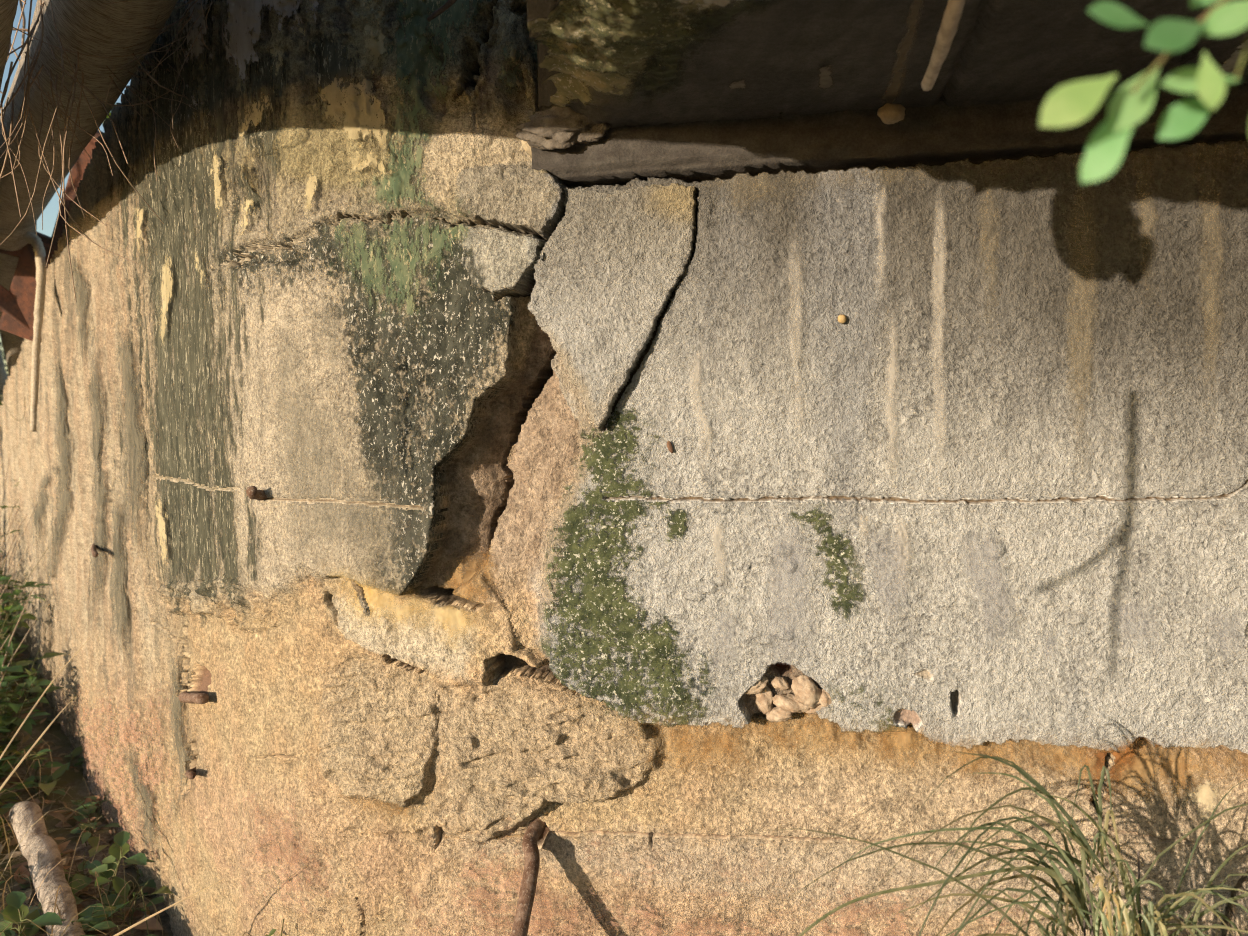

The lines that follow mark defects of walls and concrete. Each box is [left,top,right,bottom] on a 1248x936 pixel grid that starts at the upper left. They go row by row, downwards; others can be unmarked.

peeling [321,0,392,175]
water stain [498,0,776,107]
water stain [33,364,71,576]
peeling [157,256,173,342]
water stain [69,0,518,653]
peeling [323,105,697,694]
crack [490,351,557,545]
crack [601,189,700,433]
water stain [664,509,687,542]
crack [602,480,1248,505]
spalling [739,662,832,723]
crack [1221,871,1248,936]